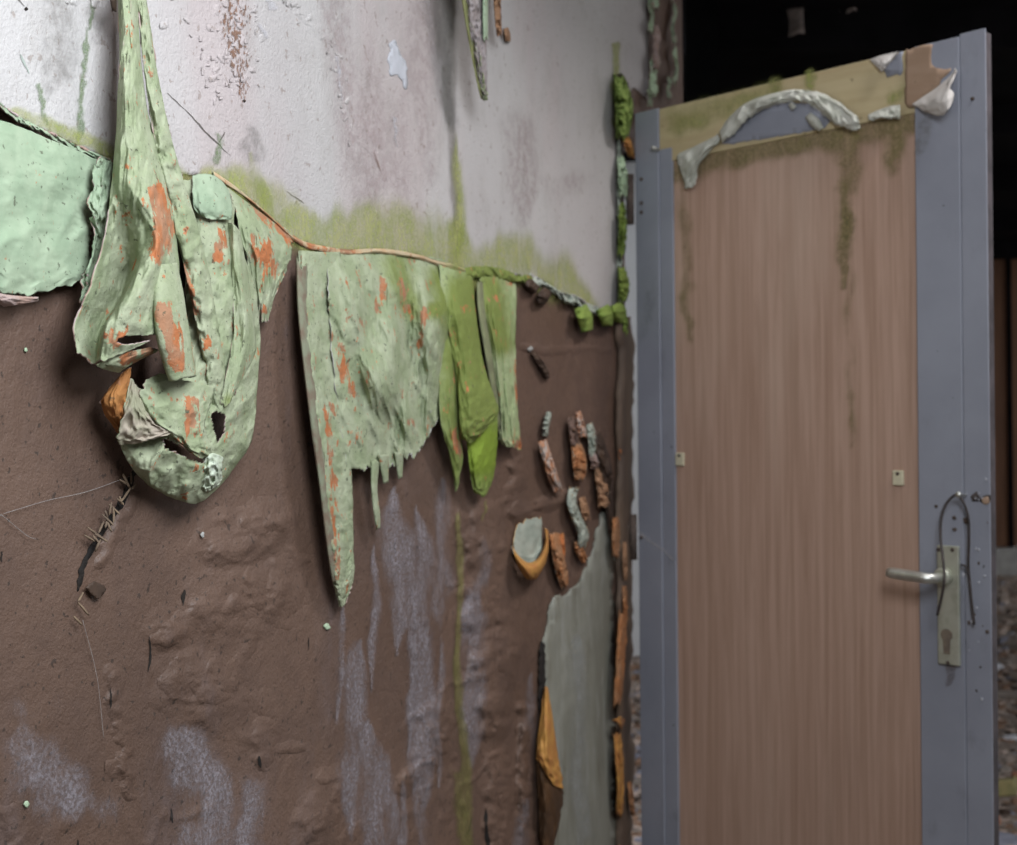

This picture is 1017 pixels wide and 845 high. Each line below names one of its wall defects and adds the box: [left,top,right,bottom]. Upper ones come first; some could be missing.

peeling [0,0,522,607]
peeling [613,72,635,335]
peeling [647,0,678,107]
peeling [677,44,957,189]
spalling [511,411,635,845]
efflorescence [167,730,257,845]